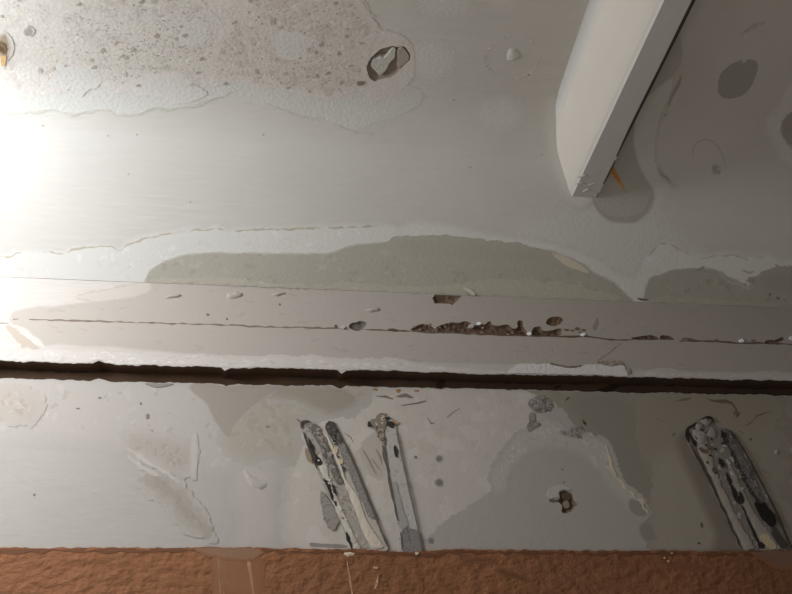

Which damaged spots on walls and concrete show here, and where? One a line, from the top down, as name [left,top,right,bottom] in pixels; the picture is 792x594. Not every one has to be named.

peeling [0,0,102,100]
peeling [332,0,416,102]
damp [0,32,792,380]